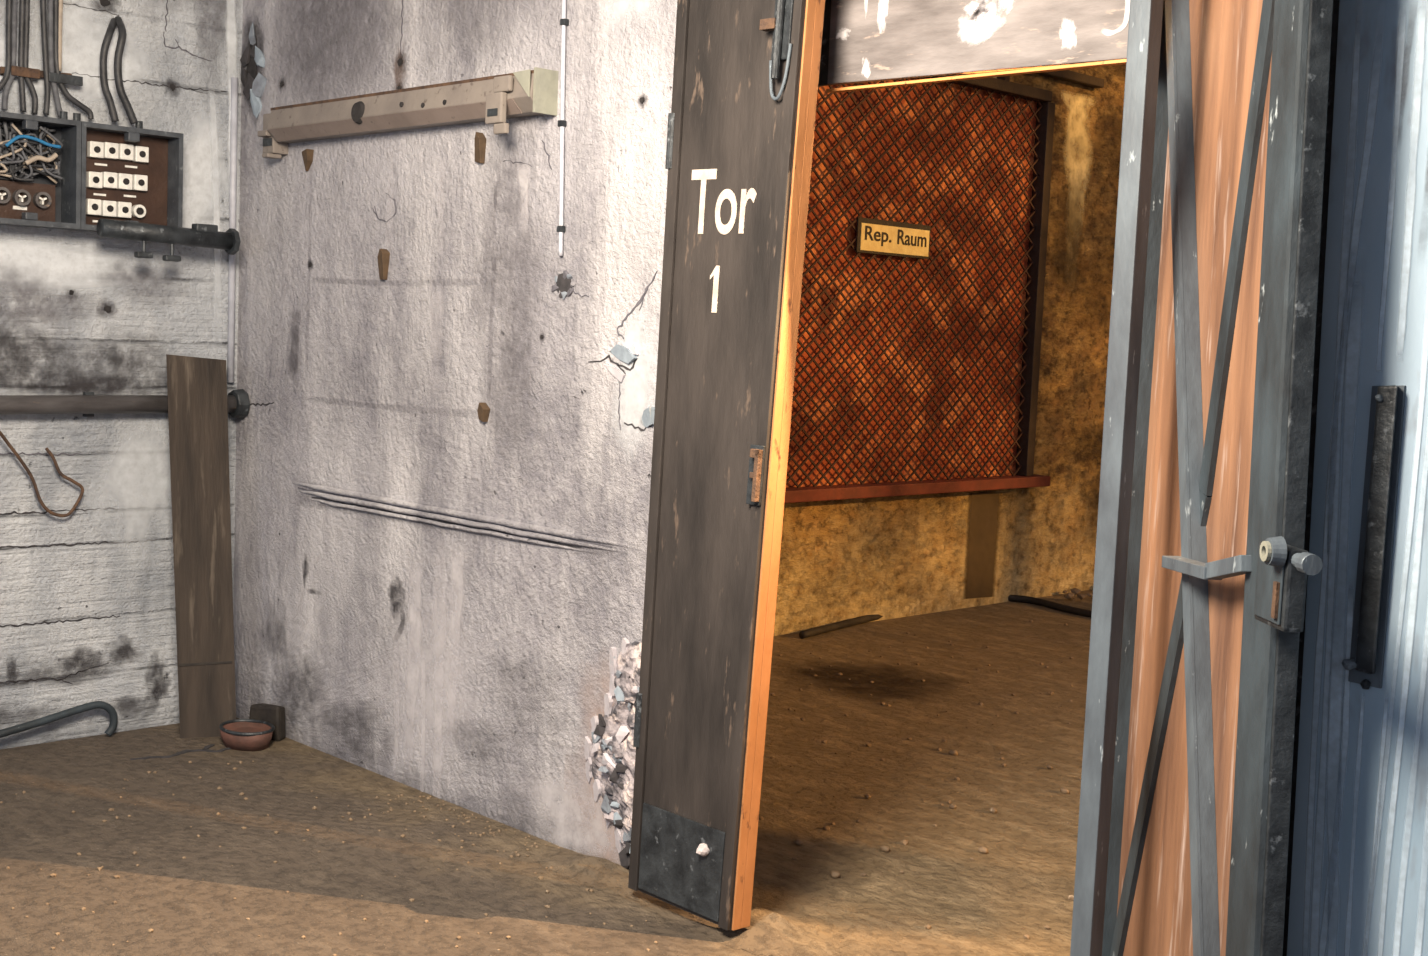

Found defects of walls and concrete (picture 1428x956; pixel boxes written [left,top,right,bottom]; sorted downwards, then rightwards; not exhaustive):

water stain [1065,95,1091,225]
crack [617,271,658,339]
water stain [33,650,97,681]
water stain [115,644,134,660]
water stain [120,664,166,710]
flaking render [584,638,642,869]